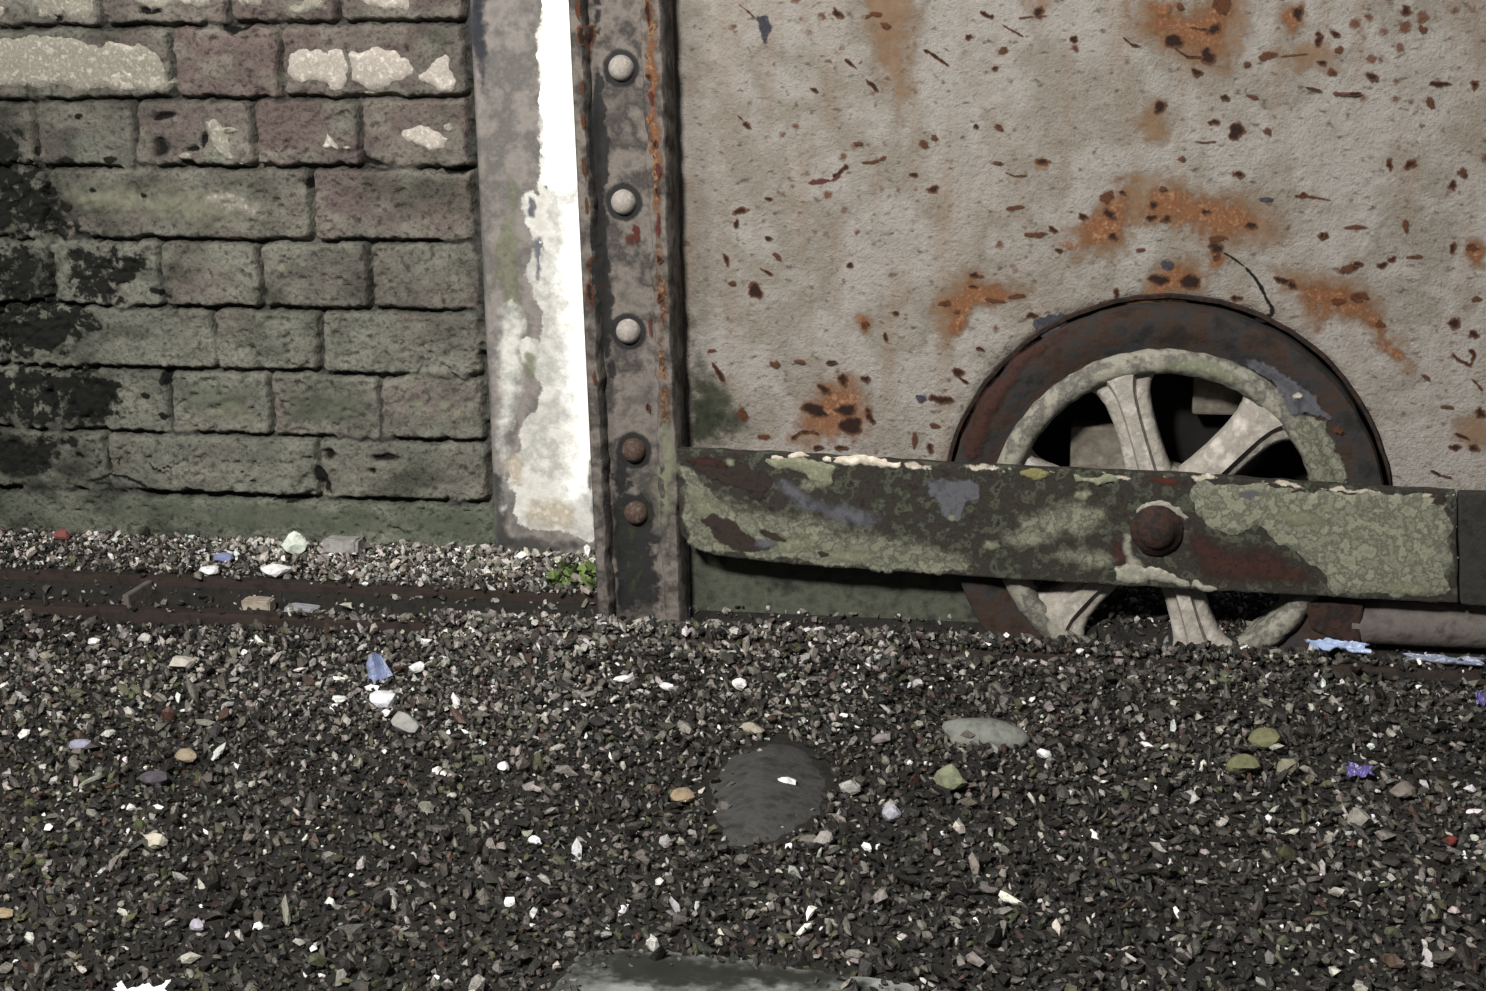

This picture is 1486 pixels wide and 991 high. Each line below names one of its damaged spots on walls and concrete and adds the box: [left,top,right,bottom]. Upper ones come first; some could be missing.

water stain [469,0,487,75]
rust [1123,0,1378,96]
rust [1195,119,1271,143]
rust [627,0,669,425]
rust [1024,176,1273,300]
water stain [0,128,175,477]
rust [1273,254,1430,381]
rust [791,360,876,451]
water stain [490,473,577,552]
peeling [679,452,1004,575]
peeling [1114,535,1217,592]
peeling [1136,473,1459,599]